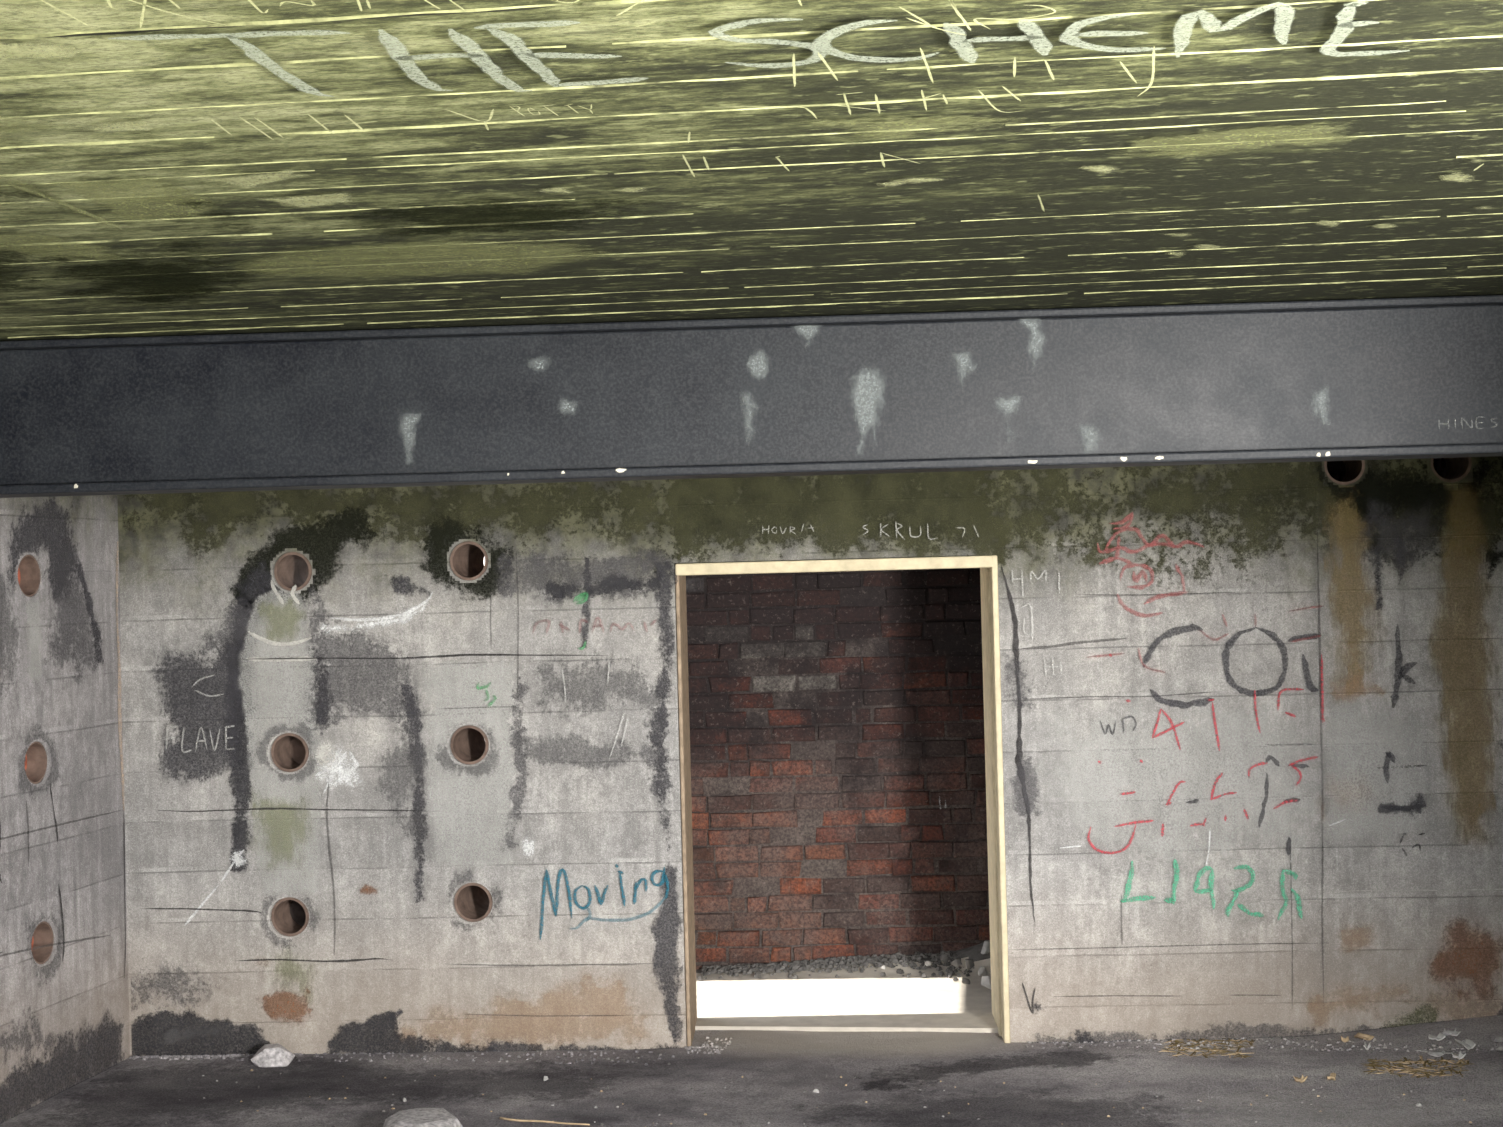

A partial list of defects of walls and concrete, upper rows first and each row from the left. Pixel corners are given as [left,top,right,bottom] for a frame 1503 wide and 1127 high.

leakage [0,186,51,204]
leakage [0,240,252,308]
leakage [0,497,120,695]
leakage [153,506,683,1051]
rust [1430,920,1503,999]